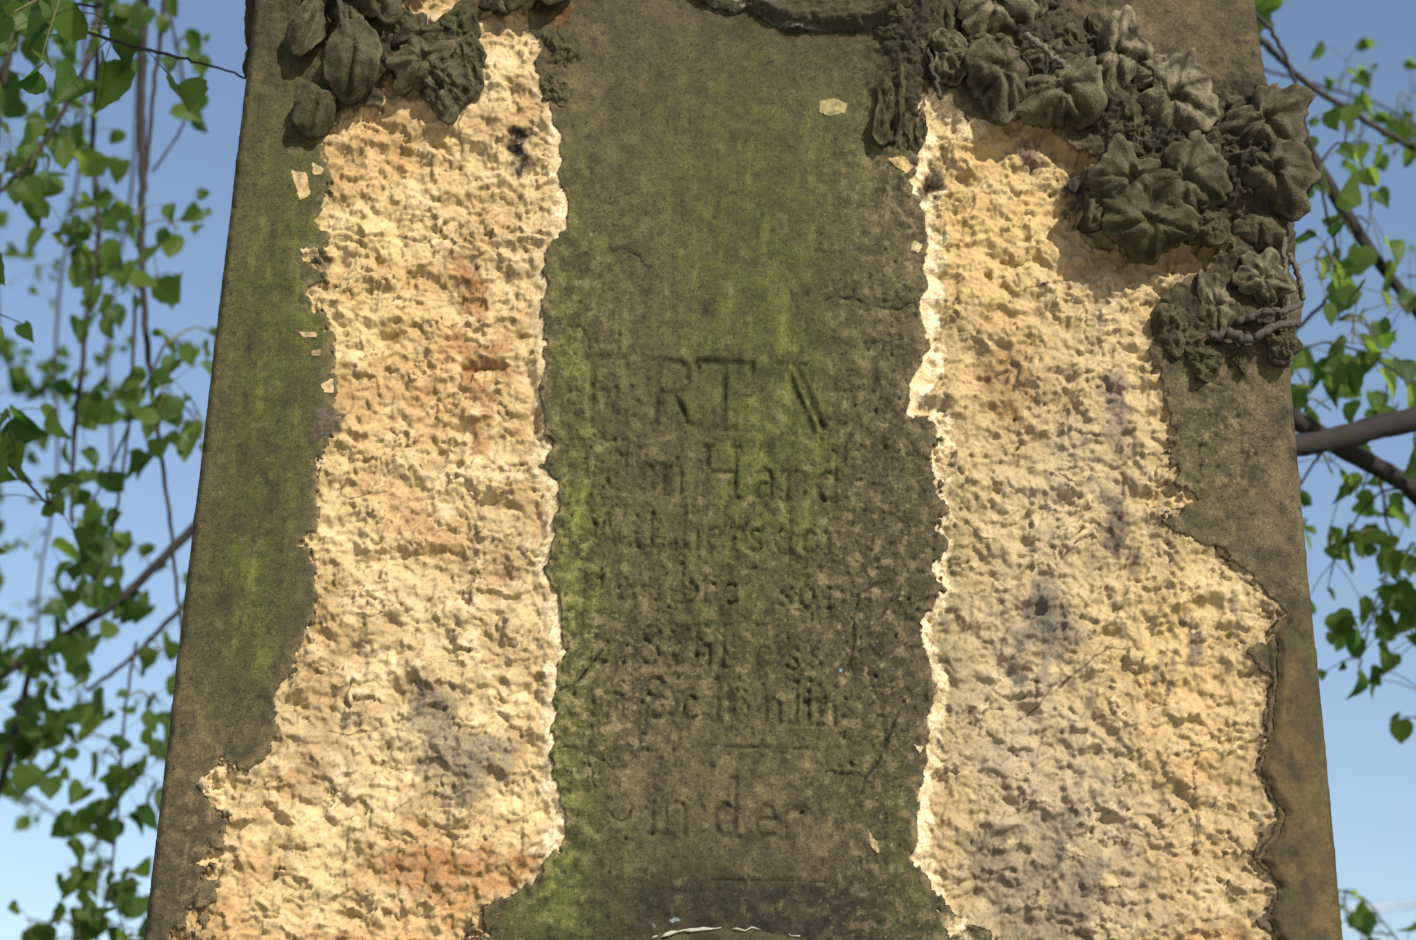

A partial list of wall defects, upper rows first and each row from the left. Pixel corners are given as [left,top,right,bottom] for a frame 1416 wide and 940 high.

spalling [169,0,569,940]
spalling [868,831,879,853]
spalling [889,87,1340,940]